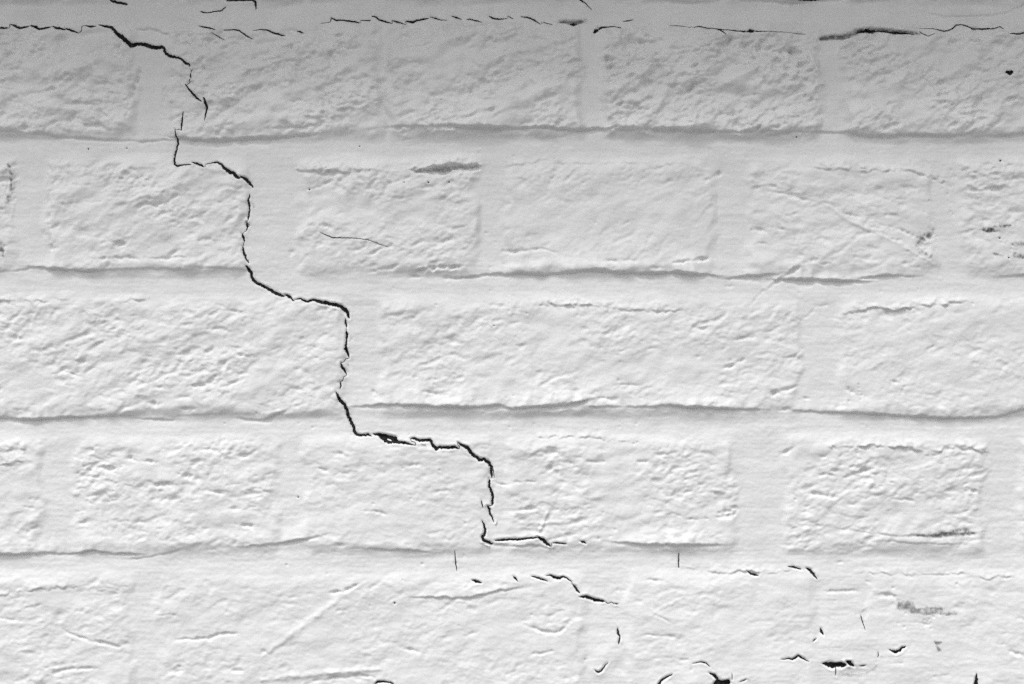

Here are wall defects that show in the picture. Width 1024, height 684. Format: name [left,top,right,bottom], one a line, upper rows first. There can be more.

crack [580,0,631,33]
crack [671,25,798,34]
crack [919,24,1024,36]
crack [0,0,586,547]
crack [788,566,817,579]
crack [782,628,824,662]